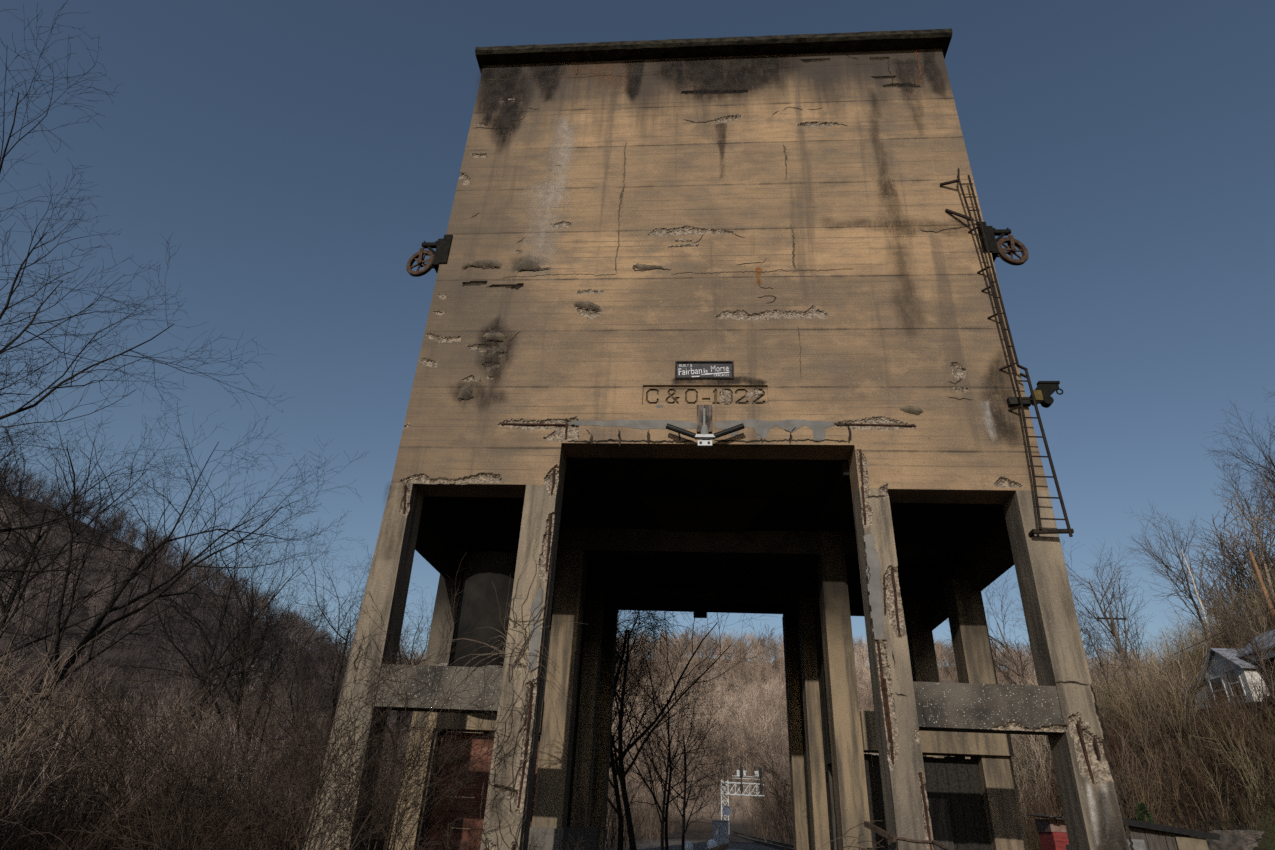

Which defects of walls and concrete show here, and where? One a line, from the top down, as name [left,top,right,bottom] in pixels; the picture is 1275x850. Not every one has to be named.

damp [624,61,643,99]
damp [661,55,788,97]
damp [481,63,560,145]
crack [505,142,853,303]
spalling [646,225,745,248]
spalling [575,289,604,319]
spalling [715,305,828,320]
spalling [497,416,580,442]
spalling [833,416,917,431]
spalling [399,472,502,518]
spalling [856,448,889,528]